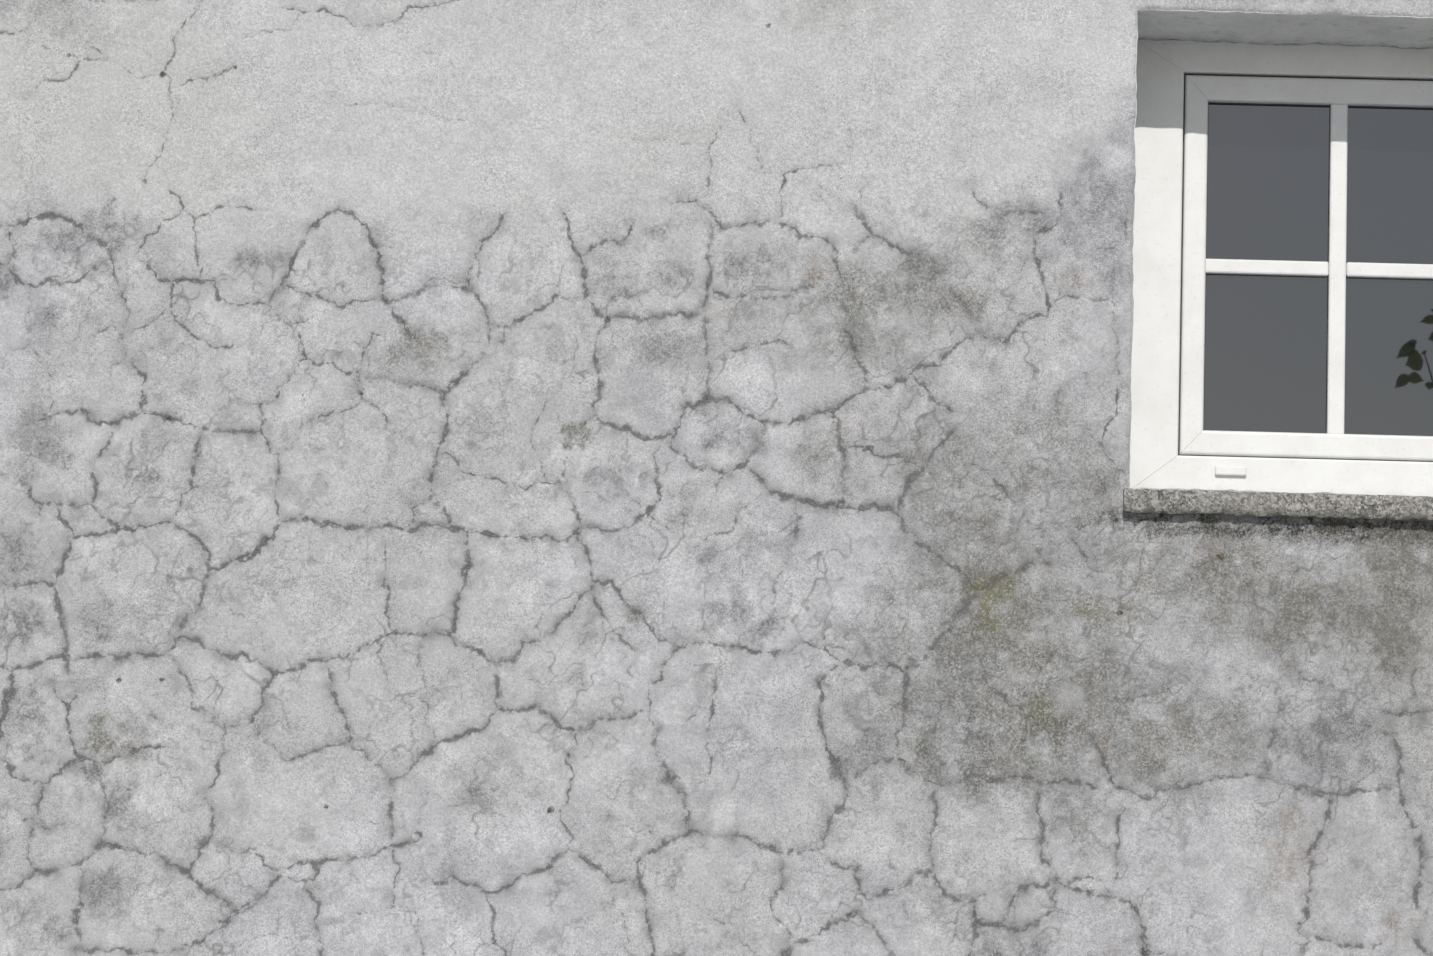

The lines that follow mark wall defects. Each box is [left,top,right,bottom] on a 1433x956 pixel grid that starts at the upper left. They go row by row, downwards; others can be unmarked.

crack [0,177,1279,956]
leakage [938,620,1072,746]
crack [1293,668,1423,948]